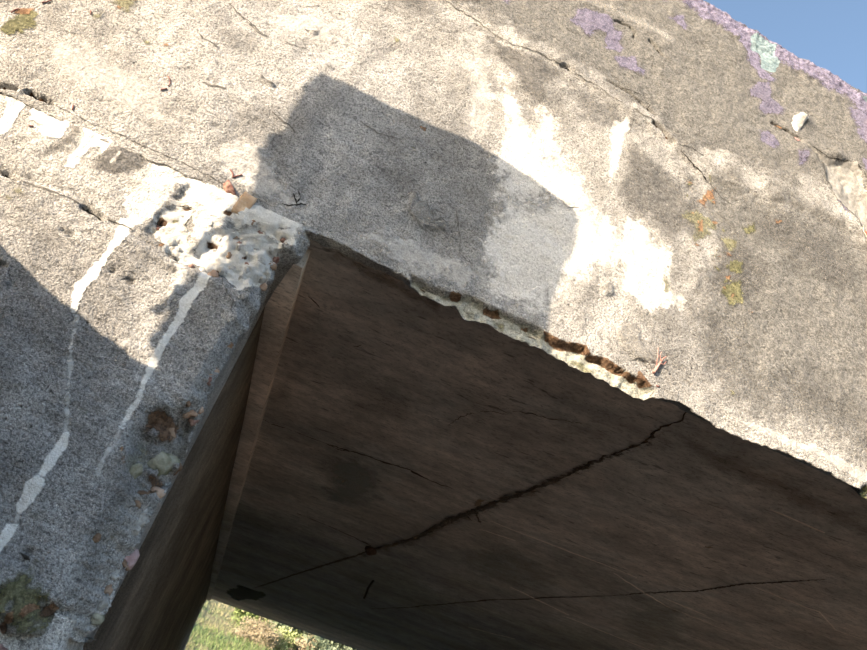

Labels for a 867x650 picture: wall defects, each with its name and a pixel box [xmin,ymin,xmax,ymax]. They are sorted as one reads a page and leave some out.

crack [0,87,223,185]
crack [445,0,733,205]
crack [1,175,134,231]
leakage [189,202,231,244]
leakage [341,0,867,484]
leakage [0,95,189,552]
leakage [119,263,211,429]
spalling [410,280,654,400]
crack [257,411,687,587]
crack [377,596,591,609]
crack [612,579,824,596]